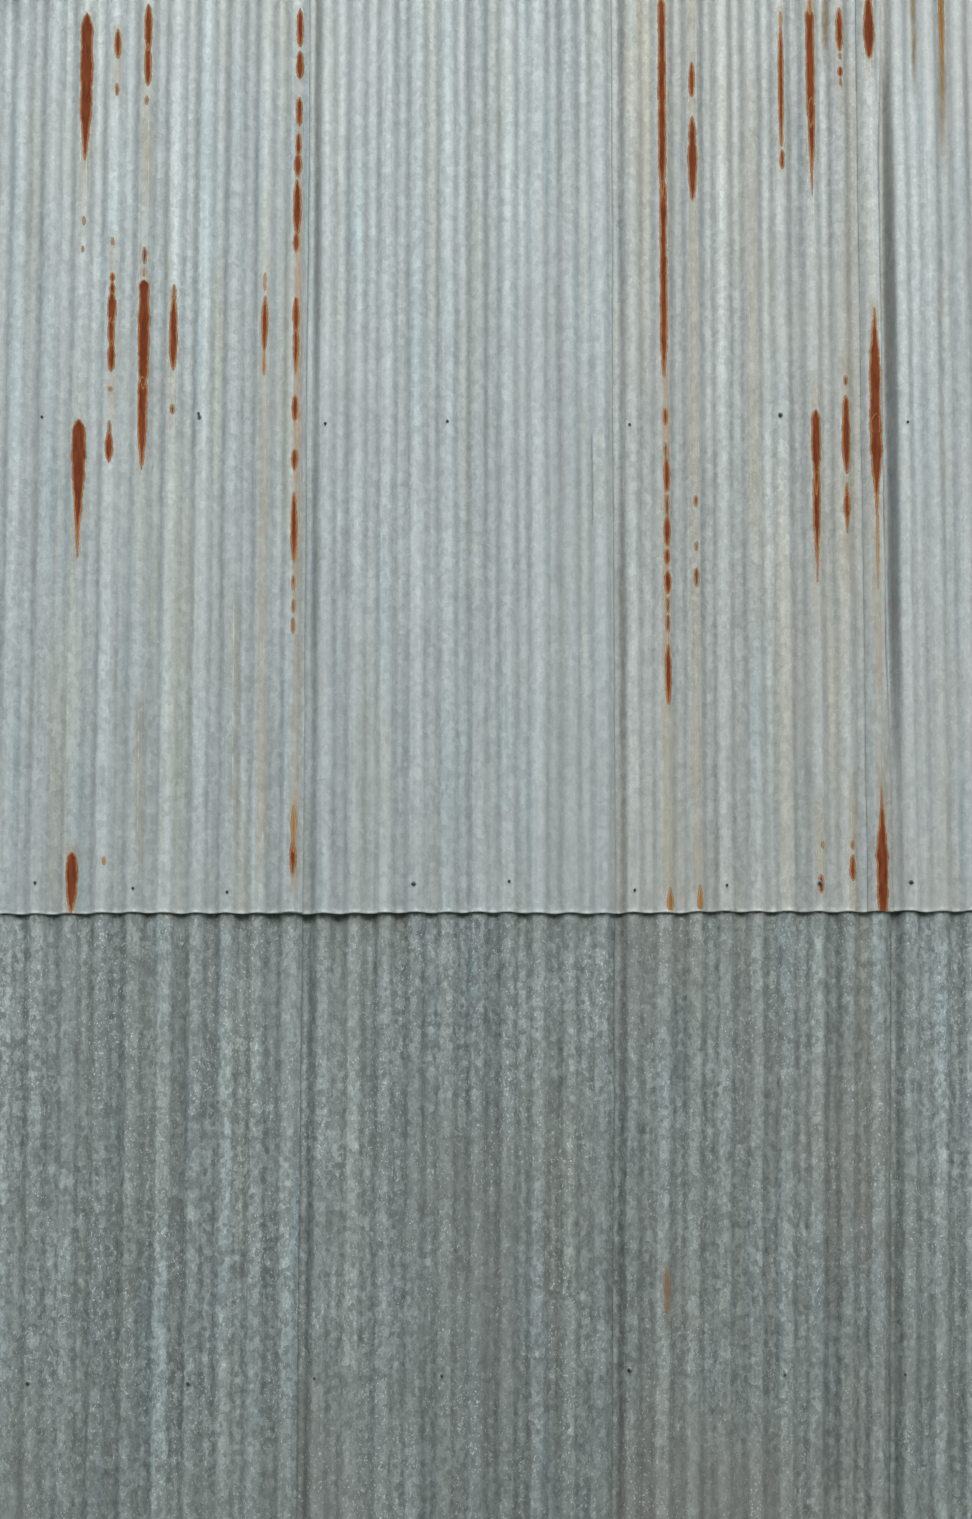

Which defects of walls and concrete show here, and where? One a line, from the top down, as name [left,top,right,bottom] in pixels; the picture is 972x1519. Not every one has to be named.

corrosion [79,13,94,160]
corrosion [292,97,303,252]
corrosion [657,0,668,378]
corrosion [805,0,815,194]
corrosion [863,0,875,58]
corrosion [107,272,117,391]
corrosion [137,247,151,470]
corrosion [70,419,86,557]
corrosion [663,408,673,705]
corrosion [811,409,821,581]
corrosion [869,307,883,584]
corrosion [876,783,889,911]